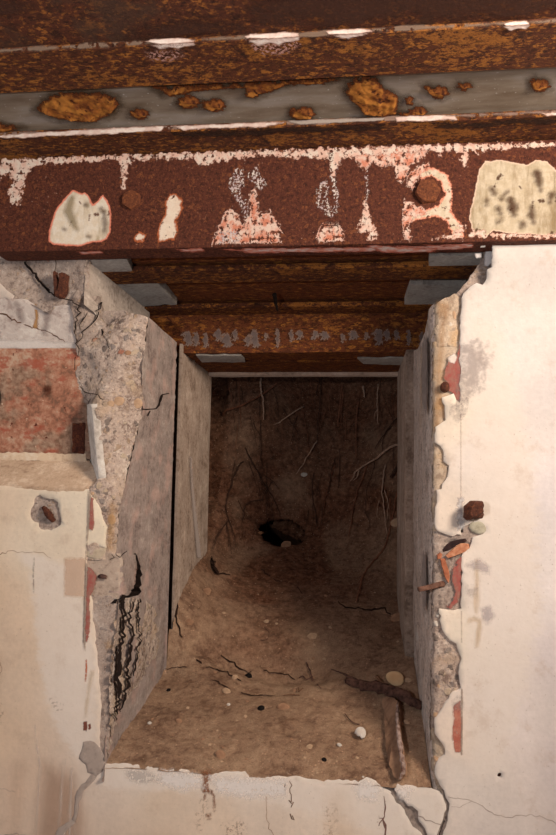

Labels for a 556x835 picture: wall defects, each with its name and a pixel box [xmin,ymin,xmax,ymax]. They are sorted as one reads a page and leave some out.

corrosion [0,122,21,133]
corrosion [35,90,150,123]
corrosion [150,75,428,117]
corrosion [288,106,316,120]
corrosion [423,82,473,100]
corrosion [530,78,552,92]
corrosion [65,197,76,227]
crack [0,260,109,400]
peeling [0,141,556,794]
corrosion [442,539,467,552]
crack [55,741,106,835]
crack [379,789,555,835]